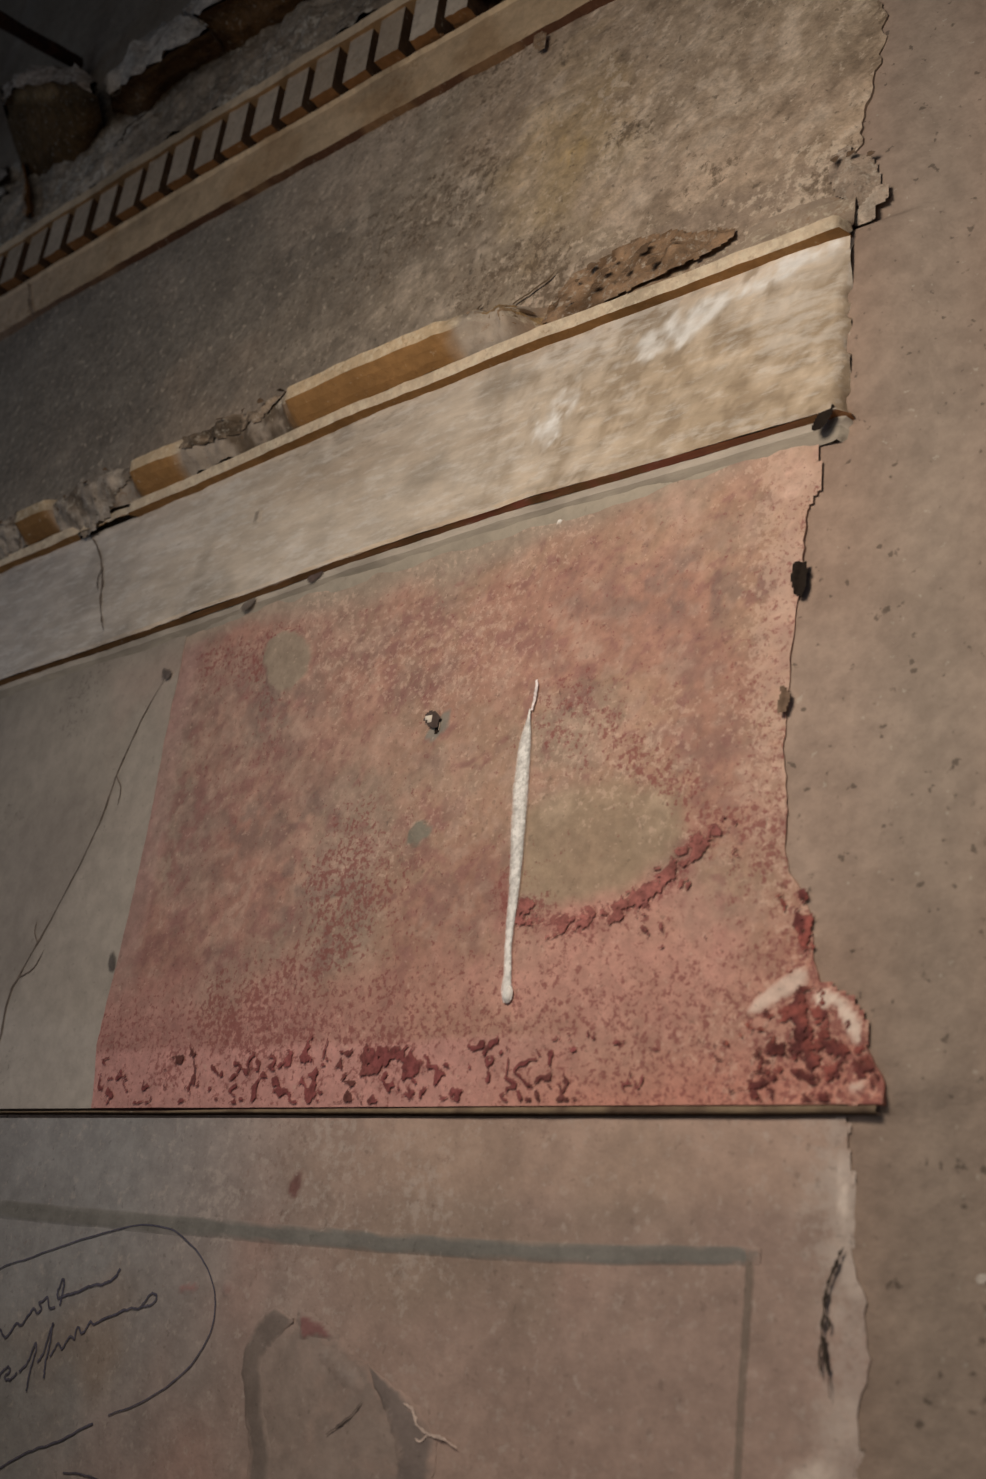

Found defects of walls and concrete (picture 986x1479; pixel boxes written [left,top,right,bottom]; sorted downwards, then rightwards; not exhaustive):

spalling [466,227,735,326]
crack [90,535,103,628]
crack [0,680,164,1039]
peeling [97,1035,462,1104]
peeling [467,1031,594,1101]
crack [818,1246,844,1399]